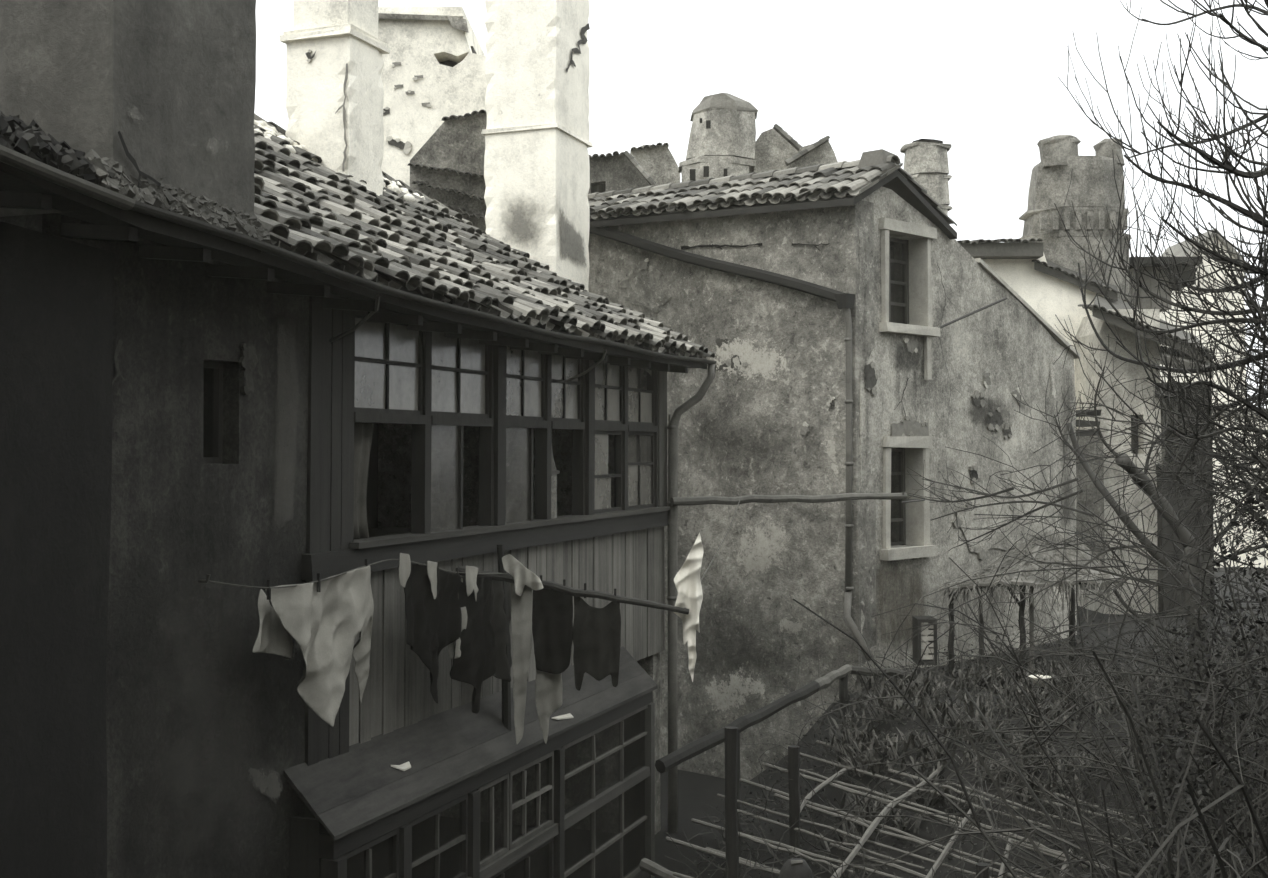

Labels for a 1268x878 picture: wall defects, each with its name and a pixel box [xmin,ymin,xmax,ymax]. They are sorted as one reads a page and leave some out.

spalling [394,75,431,108]
spalling [386,136,412,155]
spalling [903,338,918,353]
spalling [971,373,1012,440]